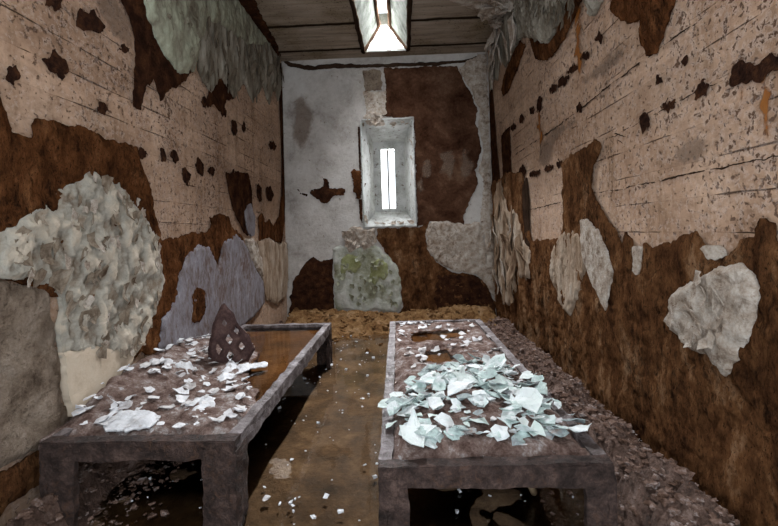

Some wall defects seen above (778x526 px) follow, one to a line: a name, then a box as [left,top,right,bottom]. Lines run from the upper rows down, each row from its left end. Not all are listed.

peeling [121,0,284,116]
peeling [0,97,289,468]
spalling [288,0,778,526]